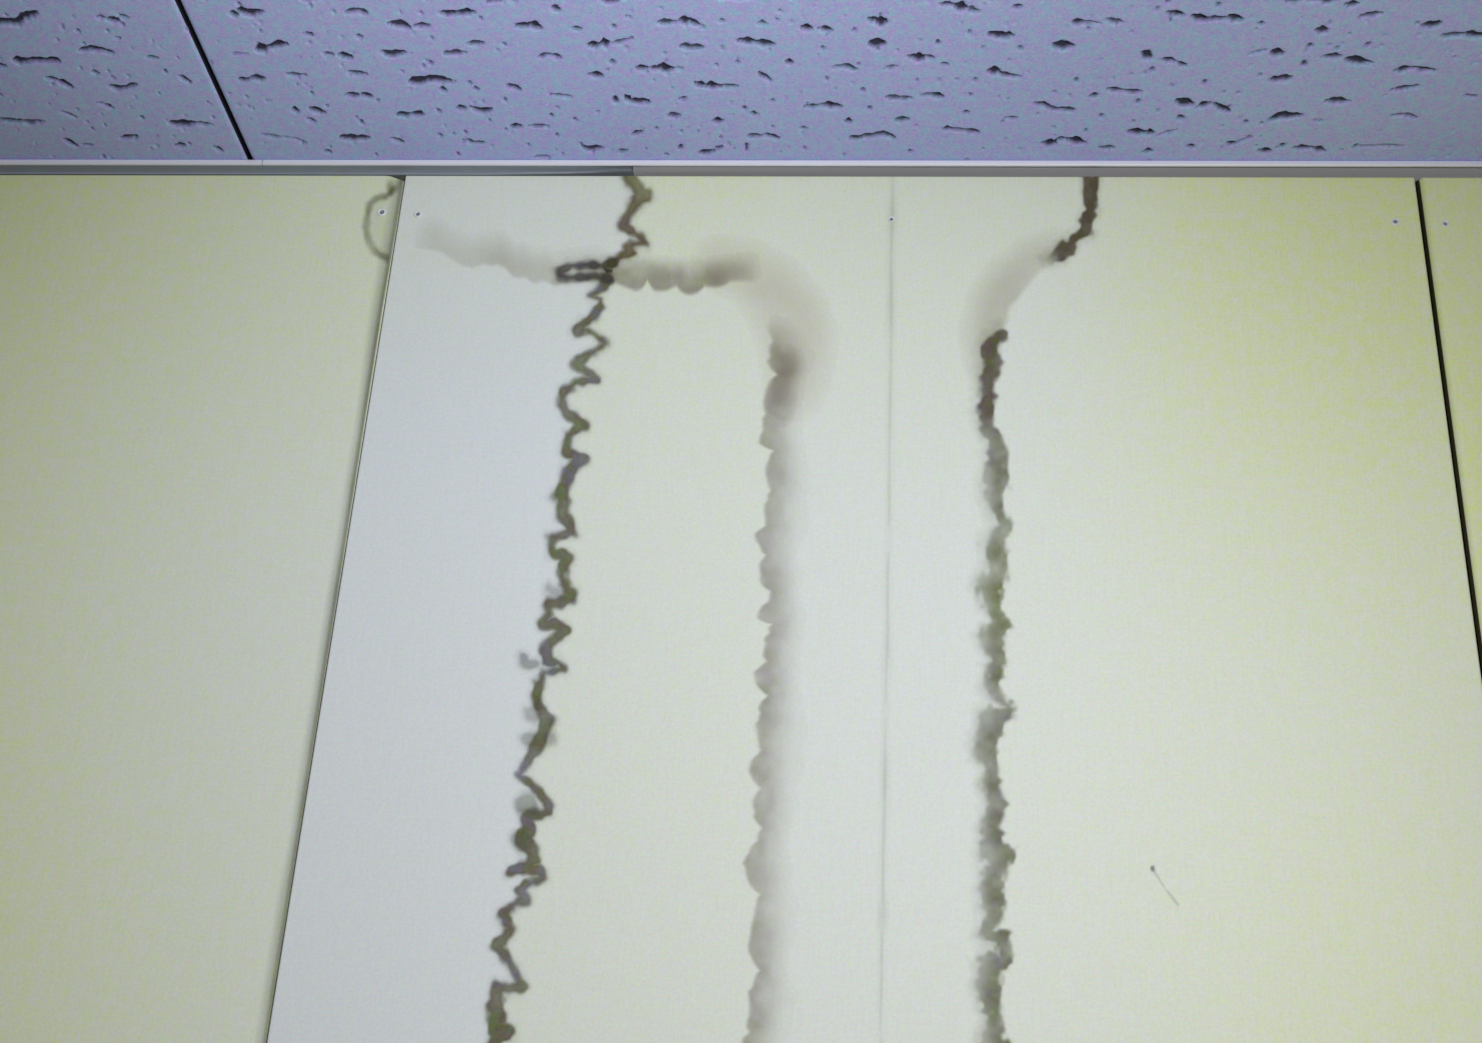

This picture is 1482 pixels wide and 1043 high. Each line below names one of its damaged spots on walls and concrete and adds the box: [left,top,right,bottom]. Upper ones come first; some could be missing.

damp [364,252,391,414]
damp [314,566,341,736]
damp [487,176,651,1043]